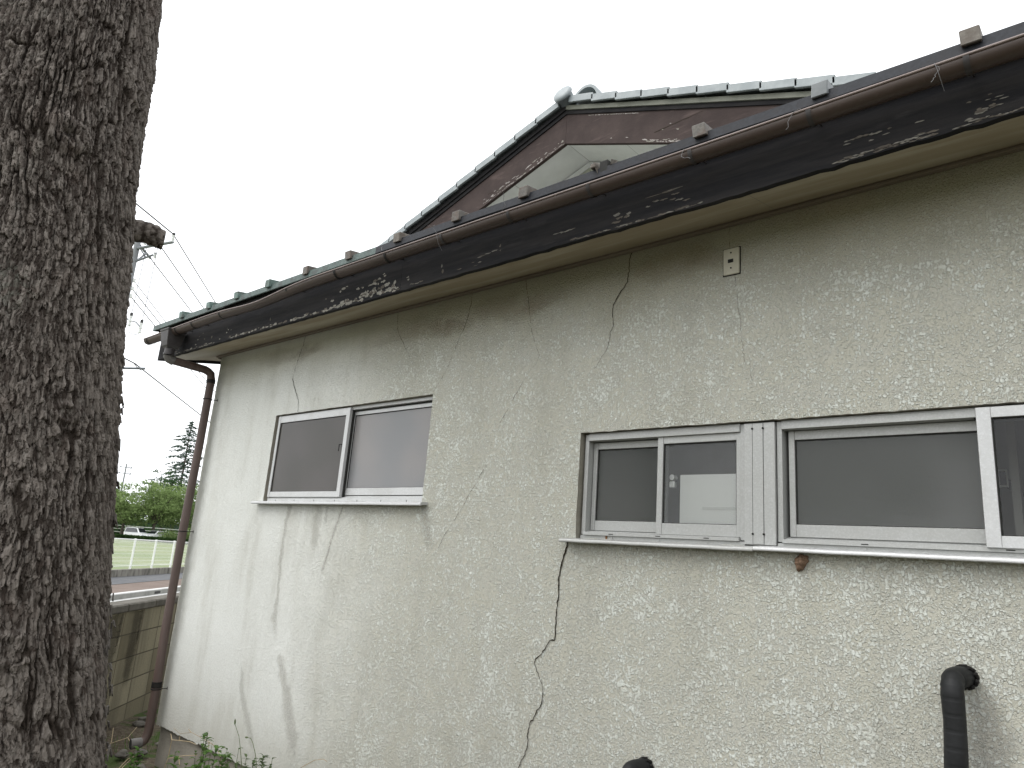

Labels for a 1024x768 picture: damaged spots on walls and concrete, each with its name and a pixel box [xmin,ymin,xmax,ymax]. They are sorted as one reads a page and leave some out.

peeling [832,120,939,164]
peeling [952,93,1024,130]
peeling [175,273,423,354]
crack [595,253,632,368]
crack [518,542,568,768]